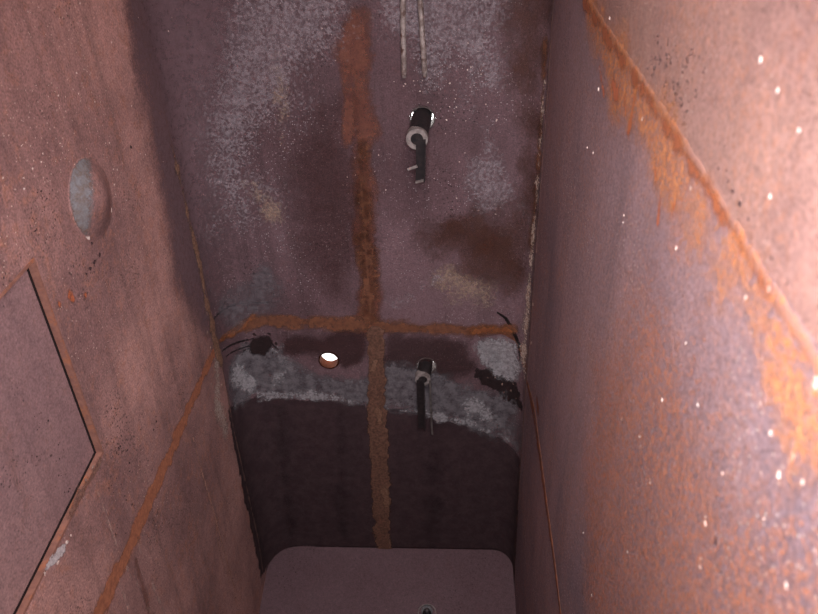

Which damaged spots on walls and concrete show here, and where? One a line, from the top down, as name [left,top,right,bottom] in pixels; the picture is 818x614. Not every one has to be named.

corrosion [583,0,727,258]
corrosion [93,350,215,614]
corrosion [221,8,518,549]
water stain [477,337,522,381]